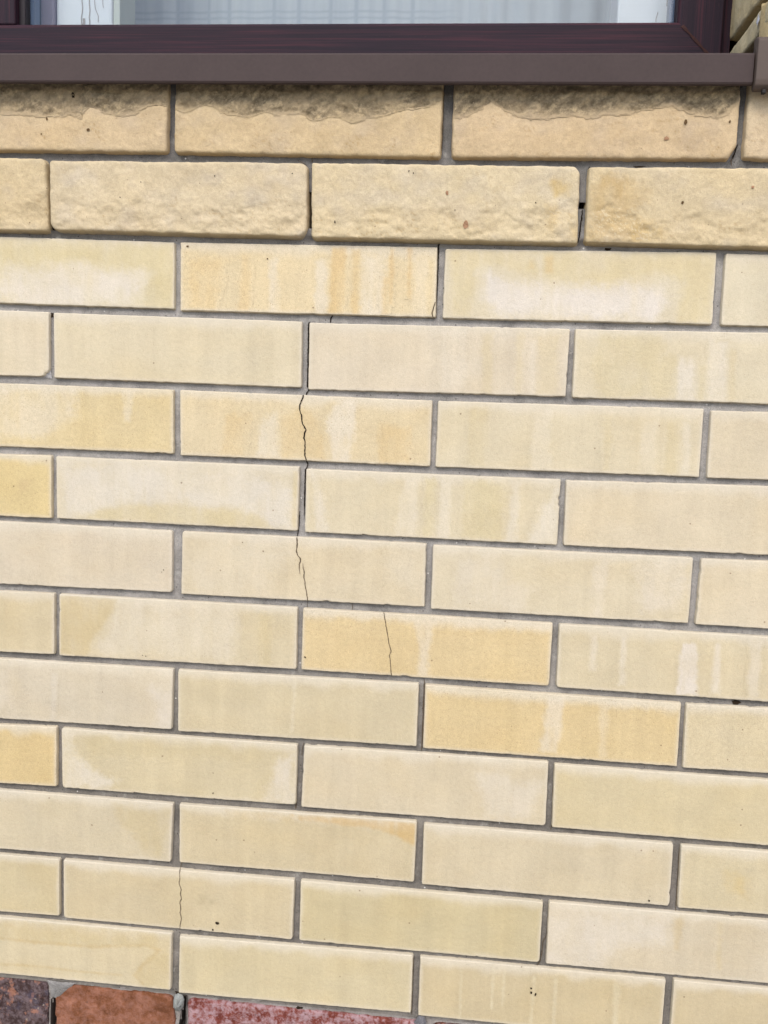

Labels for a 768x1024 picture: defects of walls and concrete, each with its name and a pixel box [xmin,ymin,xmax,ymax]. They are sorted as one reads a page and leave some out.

crack [296,315,333,608]